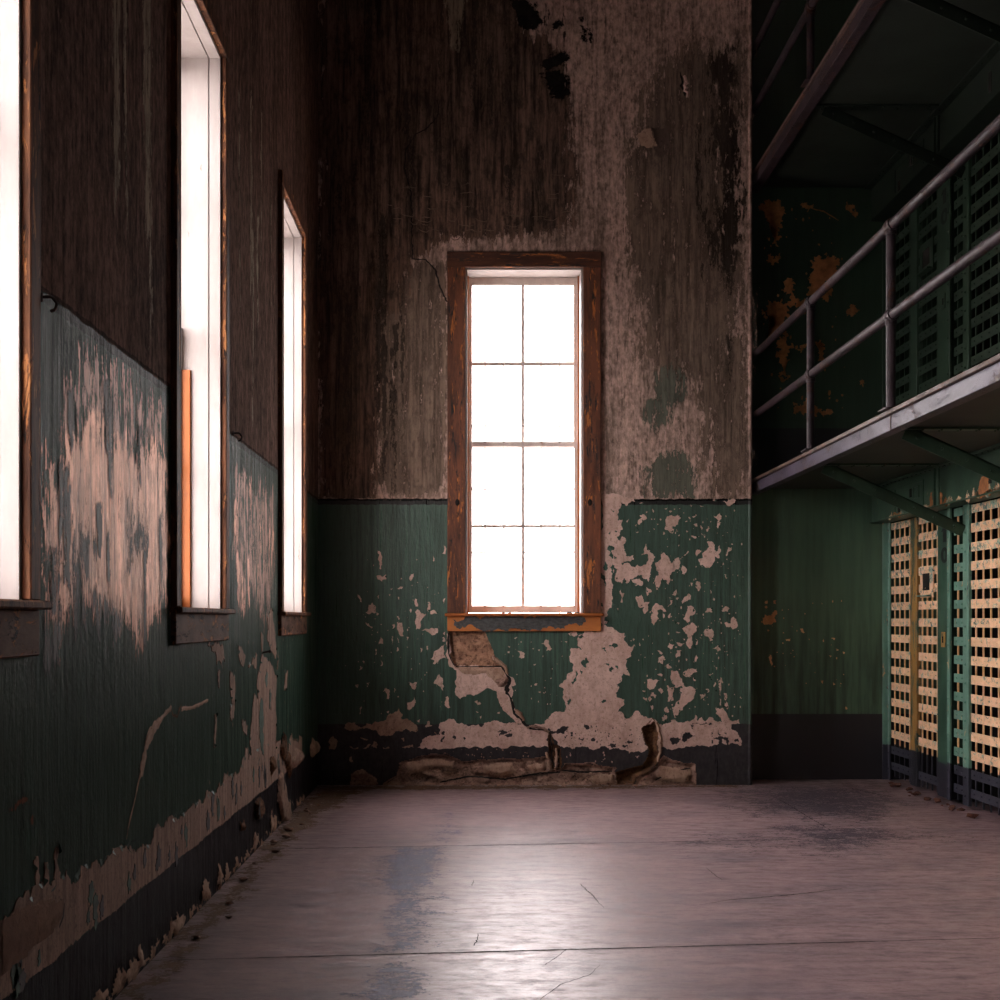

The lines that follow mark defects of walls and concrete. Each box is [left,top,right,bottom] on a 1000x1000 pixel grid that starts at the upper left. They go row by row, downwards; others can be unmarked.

peeling [41,339,171,688]
peeling [0,466,338,1000]
crack [403,101,447,302]
leakage [318,0,595,498]
crack [447,633,560,767]
peeling [345,446,742,785]
peeling [638,355,690,434]
leakage [611,26,760,498]